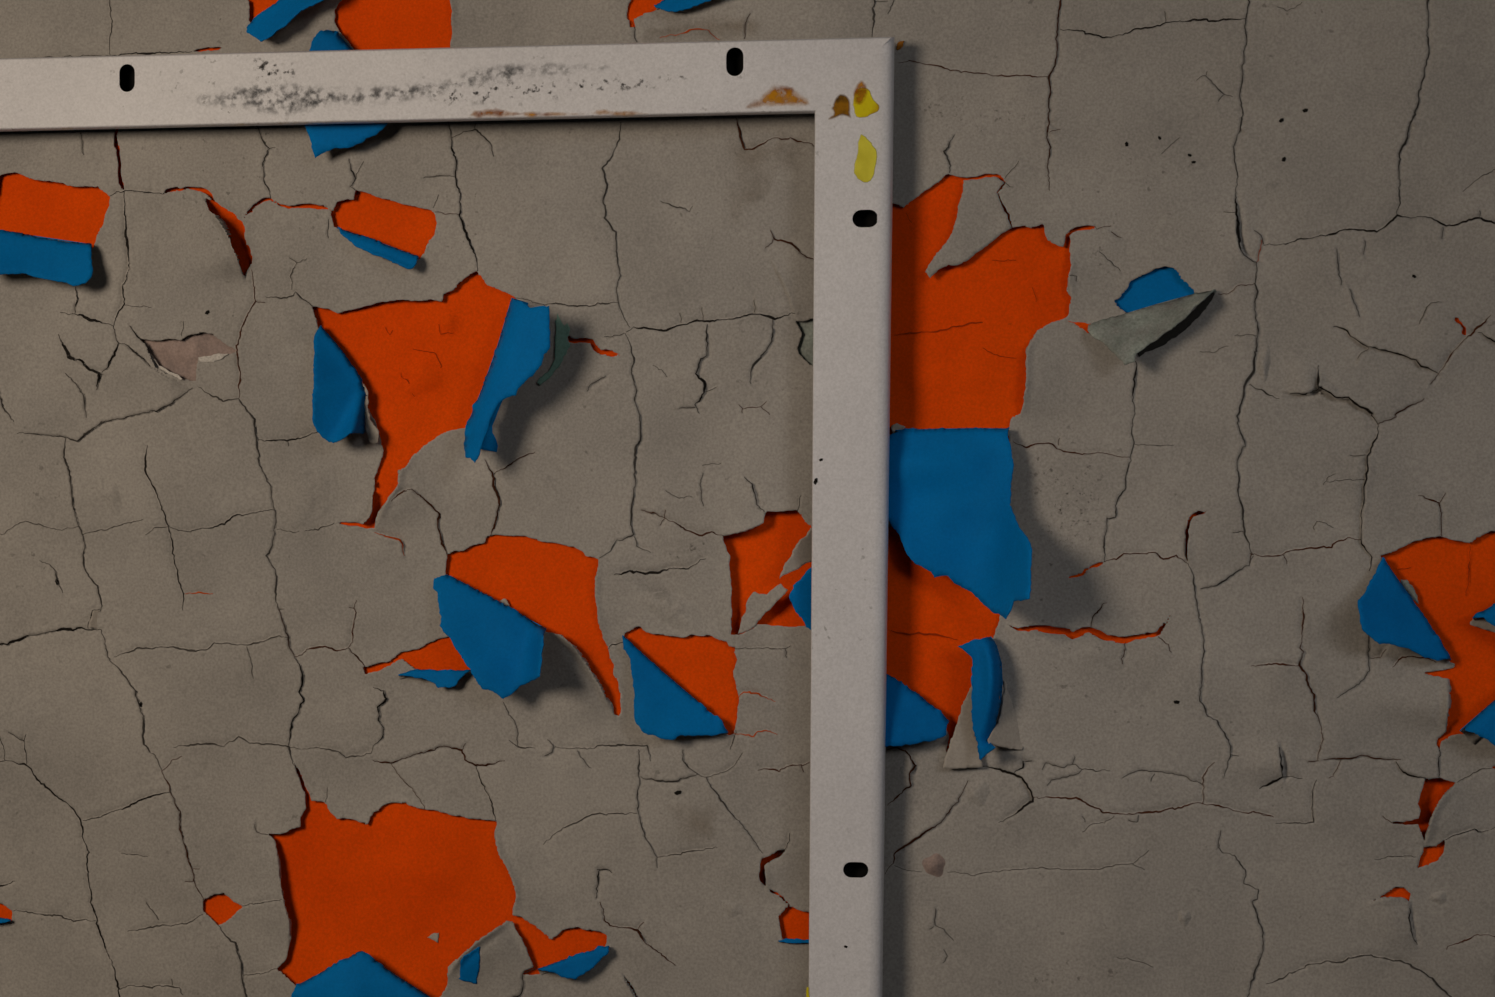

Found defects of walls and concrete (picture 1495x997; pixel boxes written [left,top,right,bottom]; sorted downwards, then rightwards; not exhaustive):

peeling [0,173,110,286]
crack [33,0,221,58]
peeling [246,0,452,51]
crack [632,14,750,42]
crack [735,117,815,150]
crack [872,0,894,33]
peeling [312,271,570,529]
peeling [885,174,1217,769]
crack [885,0,1495,997]
peeling [363,510,812,740]
peeling [1357,531,1495,750]
peeling [269,765,611,997]